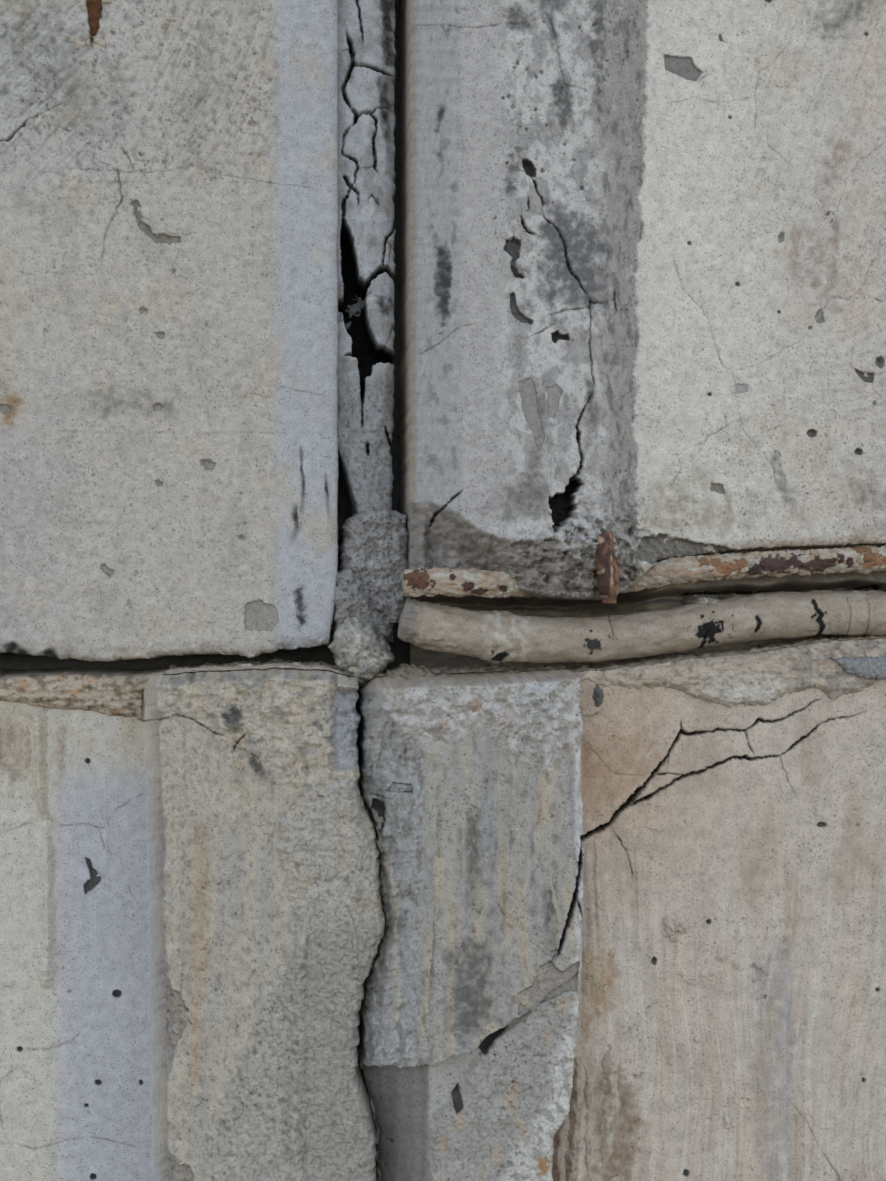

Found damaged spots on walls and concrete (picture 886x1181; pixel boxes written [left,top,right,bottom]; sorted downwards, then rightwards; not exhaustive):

peeling [664,55,709,81]
crack [341,0,394,266]
crack [521,180,615,477]
rust [403,568,436,590]
rust [450,571,507,595]
rust [699,546,886,580]
crack [554,699,845,956]